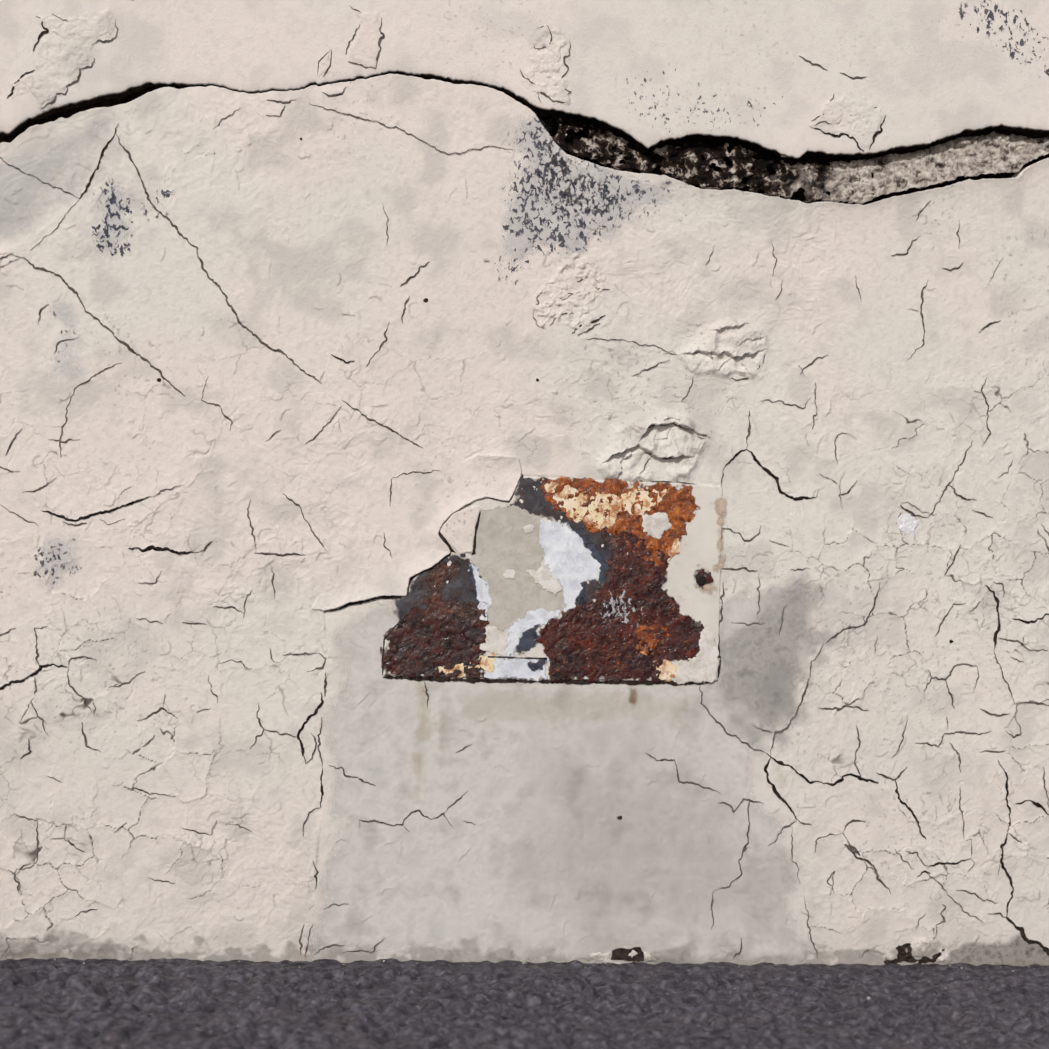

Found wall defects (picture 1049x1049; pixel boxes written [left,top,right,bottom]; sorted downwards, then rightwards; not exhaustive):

peeling [959,0,1049,77]
peeling [310,87,673,352]
crack [0,71,1049,457]
crack [721,355,857,509]
crack [0,626,101,760]
crack [136,493,326,625]
crack [250,672,375,836]
rust [380,560,491,681]
peeling [311,454,824,964]
rust [533,476,704,703]
damp [722,581,814,722]
crack [646,567,1049,959]